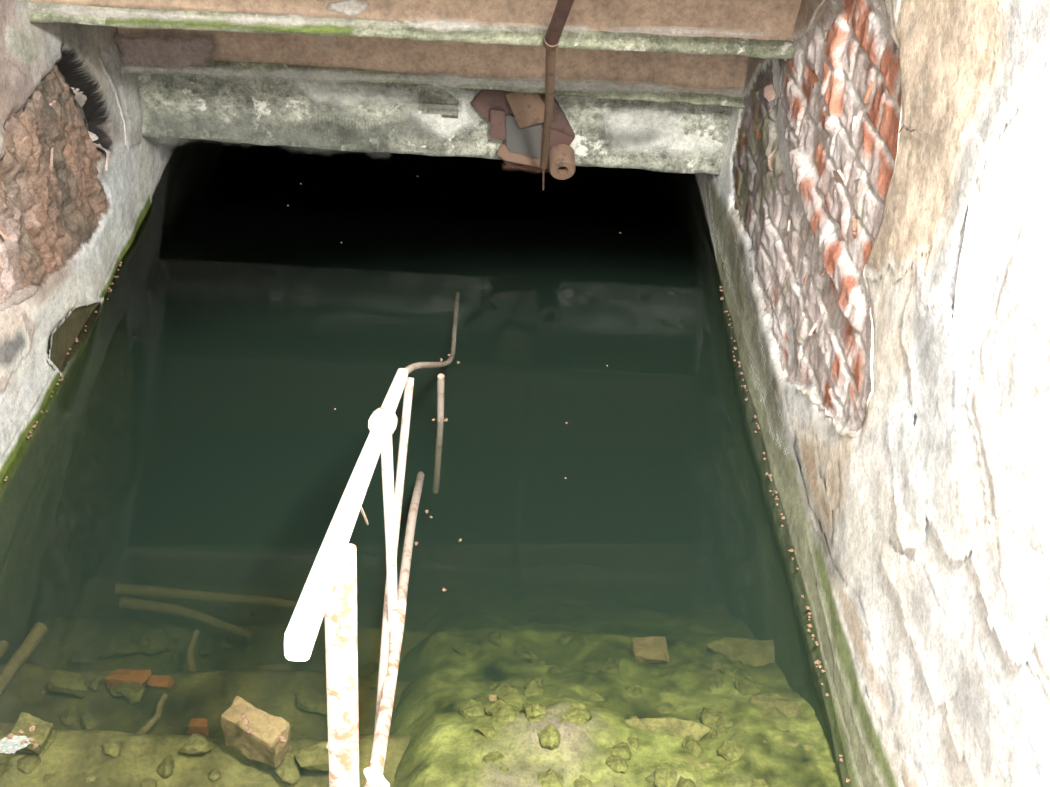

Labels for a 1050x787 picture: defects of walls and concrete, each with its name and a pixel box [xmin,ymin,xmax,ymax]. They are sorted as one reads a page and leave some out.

flaking render [1,16,44,76]
spalling [0,61,111,402]
spalling [733,0,1000,438]